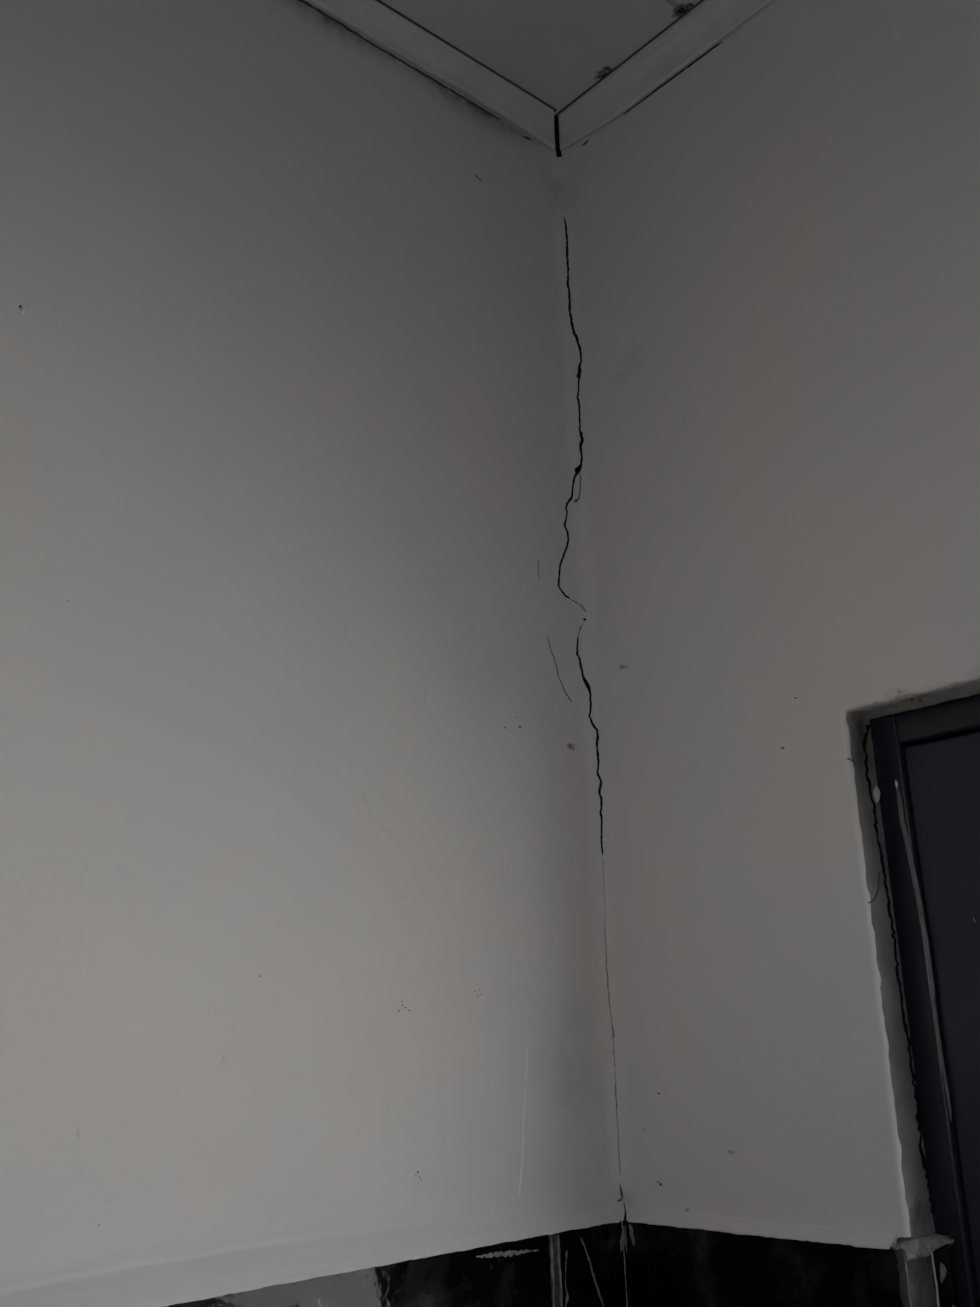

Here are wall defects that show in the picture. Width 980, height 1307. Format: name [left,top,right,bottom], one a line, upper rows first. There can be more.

crack [538,218,626,1220]